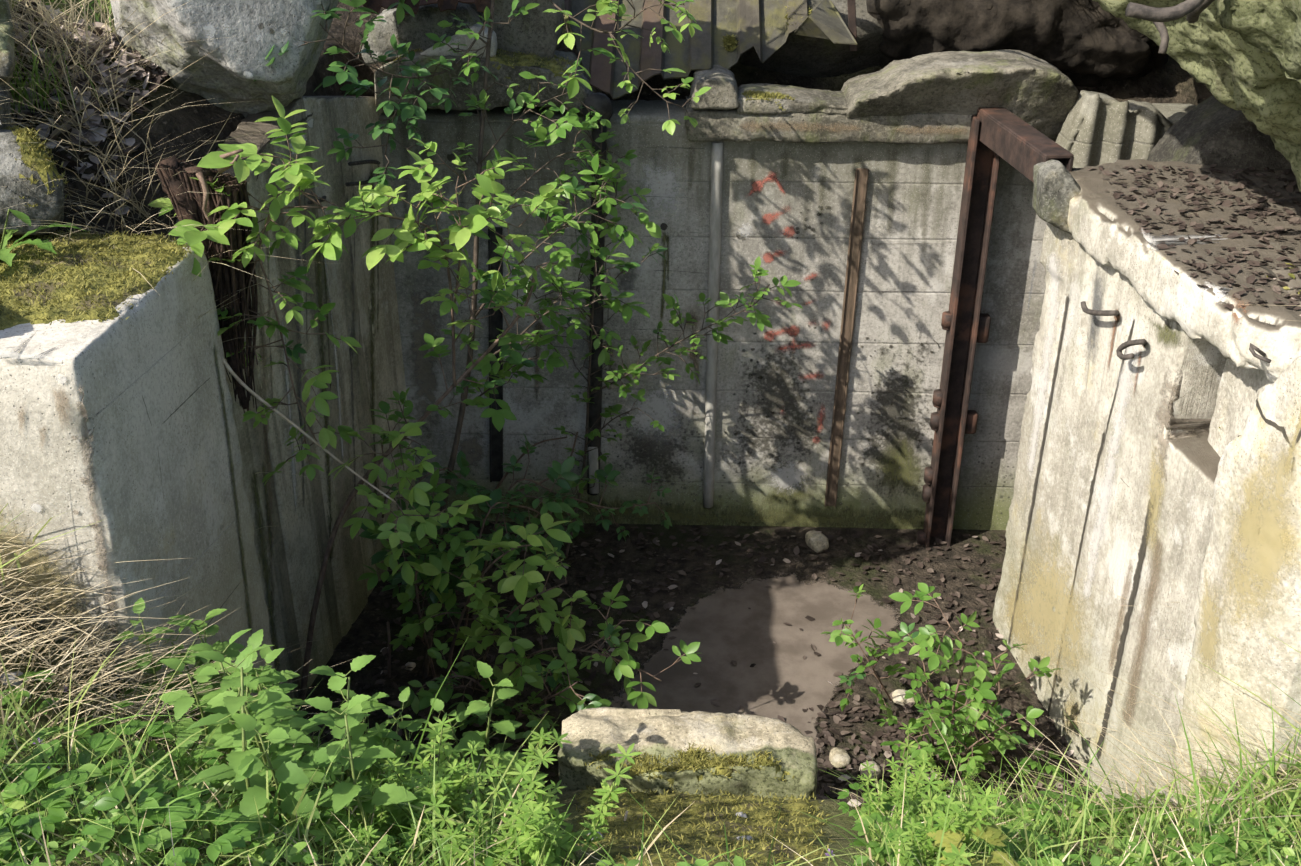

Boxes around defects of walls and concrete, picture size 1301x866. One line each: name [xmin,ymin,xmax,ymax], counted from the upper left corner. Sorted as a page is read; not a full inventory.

rust [1108,314,1120,366]
damp [614,390,703,485]
damp [724,333,820,489]
mould [852,337,934,494]
crack [1256,398,1301,475]